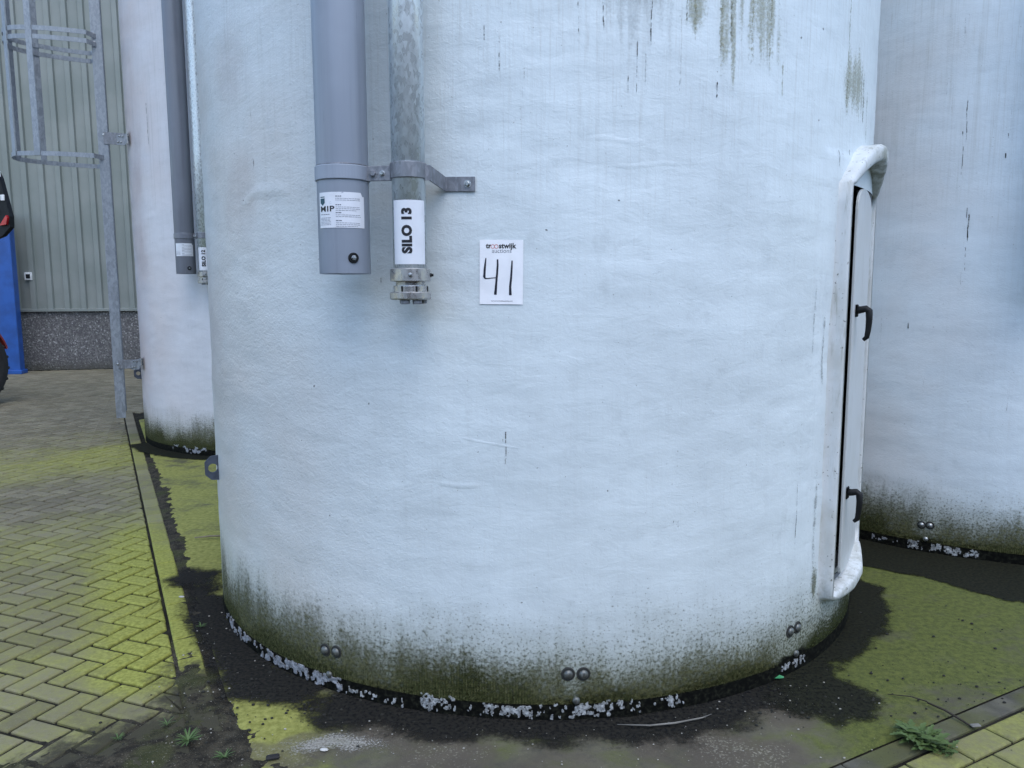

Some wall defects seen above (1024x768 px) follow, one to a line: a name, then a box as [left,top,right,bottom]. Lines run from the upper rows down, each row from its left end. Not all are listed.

water stain [165,567,893,751]